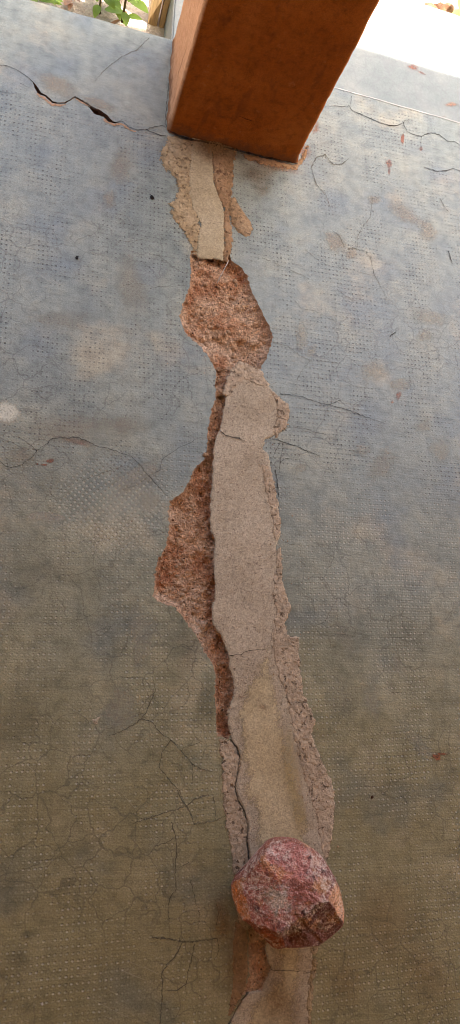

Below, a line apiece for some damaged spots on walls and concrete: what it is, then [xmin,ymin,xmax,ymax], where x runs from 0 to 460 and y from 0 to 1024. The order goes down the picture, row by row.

crack [0,38,349,206]
crack [328,96,460,172]
crack [3,437,195,493]
spalling [152,251,273,739]
crack [107,676,250,1024]
spalling [242,927,271,995]